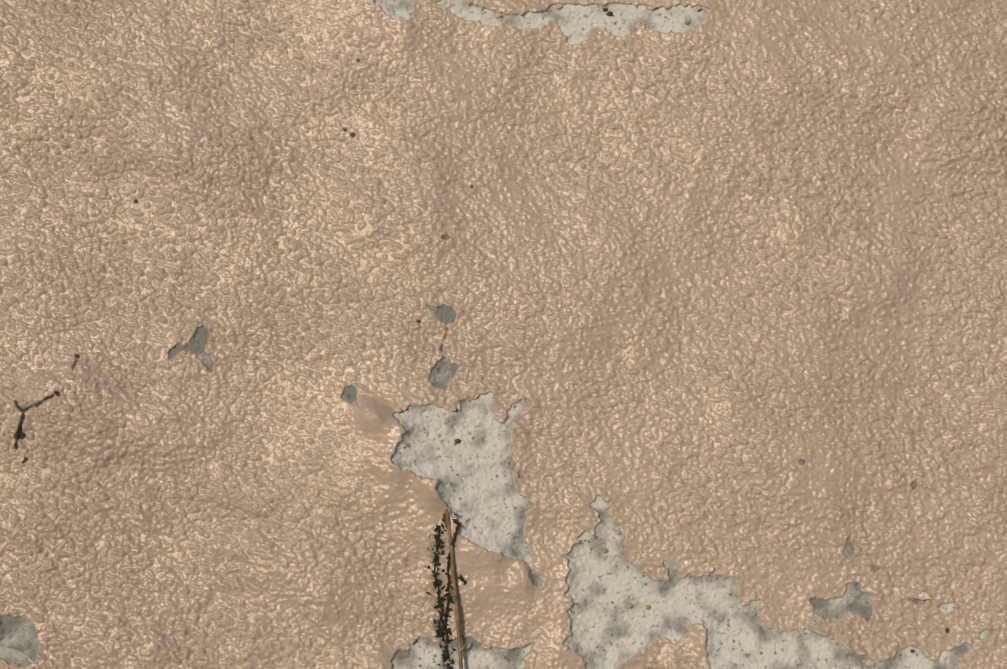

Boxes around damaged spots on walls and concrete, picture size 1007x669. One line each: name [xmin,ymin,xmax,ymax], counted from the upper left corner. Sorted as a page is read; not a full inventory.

peeling [299,0,732,97]
peeling [149,305,234,395]
crack [15,392,60,462]
peeling [310,285,1000,669]
peeling [0,593,61,669]